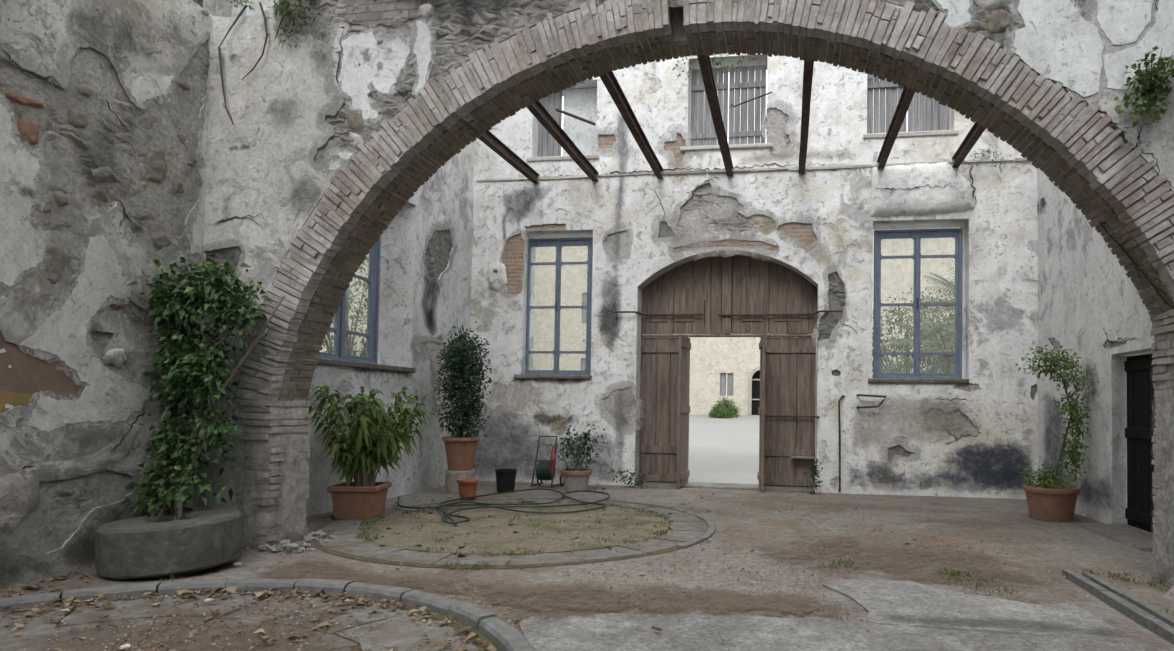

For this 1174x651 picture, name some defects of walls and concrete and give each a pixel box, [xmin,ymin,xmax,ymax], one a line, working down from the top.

spalling [274,0,693,170]
peeling [796,0,1174,100]
spalling [761,103,798,157]
spalling [0,32,245,442]
spalling [500,223,566,296]
spalling [653,180,821,259]
damp [423,279,439,334]
spalling [812,268,847,347]
crack [110,406,148,453]
damp [852,444,1030,491]
damp [1044,400,1111,506]